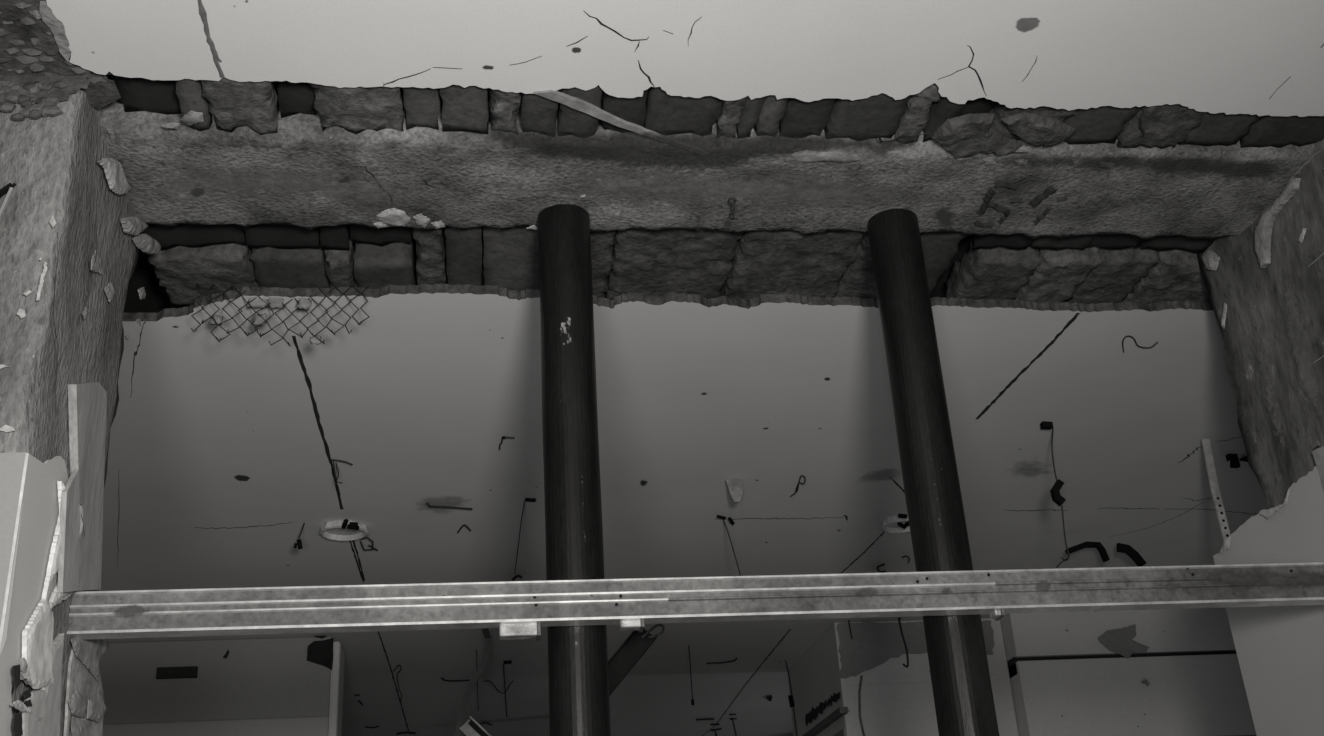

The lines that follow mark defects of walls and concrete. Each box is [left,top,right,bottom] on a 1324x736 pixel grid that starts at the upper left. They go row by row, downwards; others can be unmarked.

flaking render [0,0,121,121]
crack [383,67,461,87]
crack [512,11,700,86]
crack [940,45,987,96]
flaking render [97,158,131,195]
spalling [771,150,864,168]
spalling [932,112,1077,165]
flaking render [120,216,161,254]
spalling [373,208,445,229]
flaking render [1254,178,1301,268]
spalling [17,257,48,319]
flaking render [10,481,109,736]